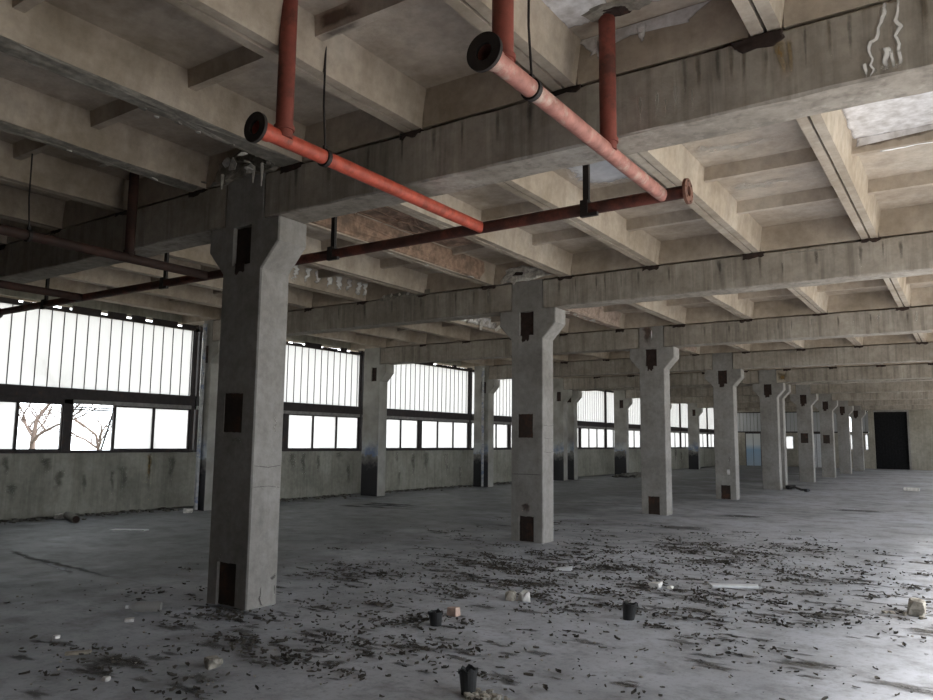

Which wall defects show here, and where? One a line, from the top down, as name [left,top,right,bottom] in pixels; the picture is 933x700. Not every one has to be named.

peeling [542,0,660,28]
peeling [615,0,711,43]
efflorescence [863,0,903,76]
efflorescence [293,265,368,295]